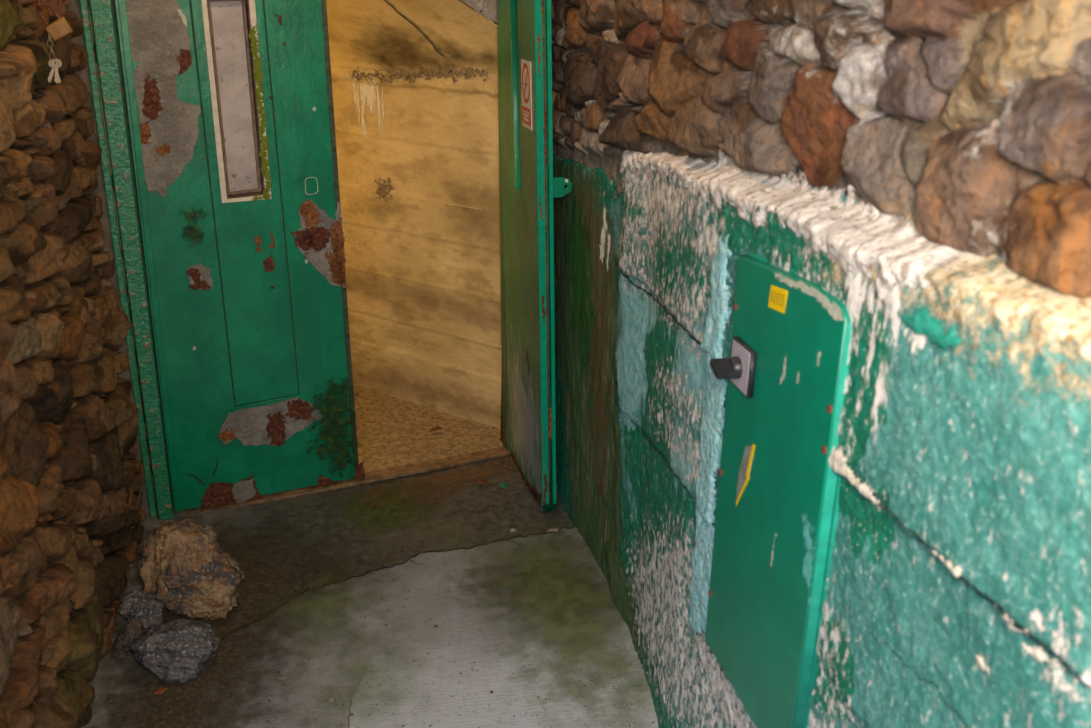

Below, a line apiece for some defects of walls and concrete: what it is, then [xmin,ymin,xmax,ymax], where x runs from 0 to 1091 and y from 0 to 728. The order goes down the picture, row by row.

crack [384,0,445,58]
peeling [126,0,200,197]
leakage [342,63,391,139]
peeling [291,199,347,289]
leakage [599,165,724,367]
leakage [772,245,1091,453]
peeling [218,397,322,447]
leakage [468,531,618,625]
crack [828,446,1081,682]